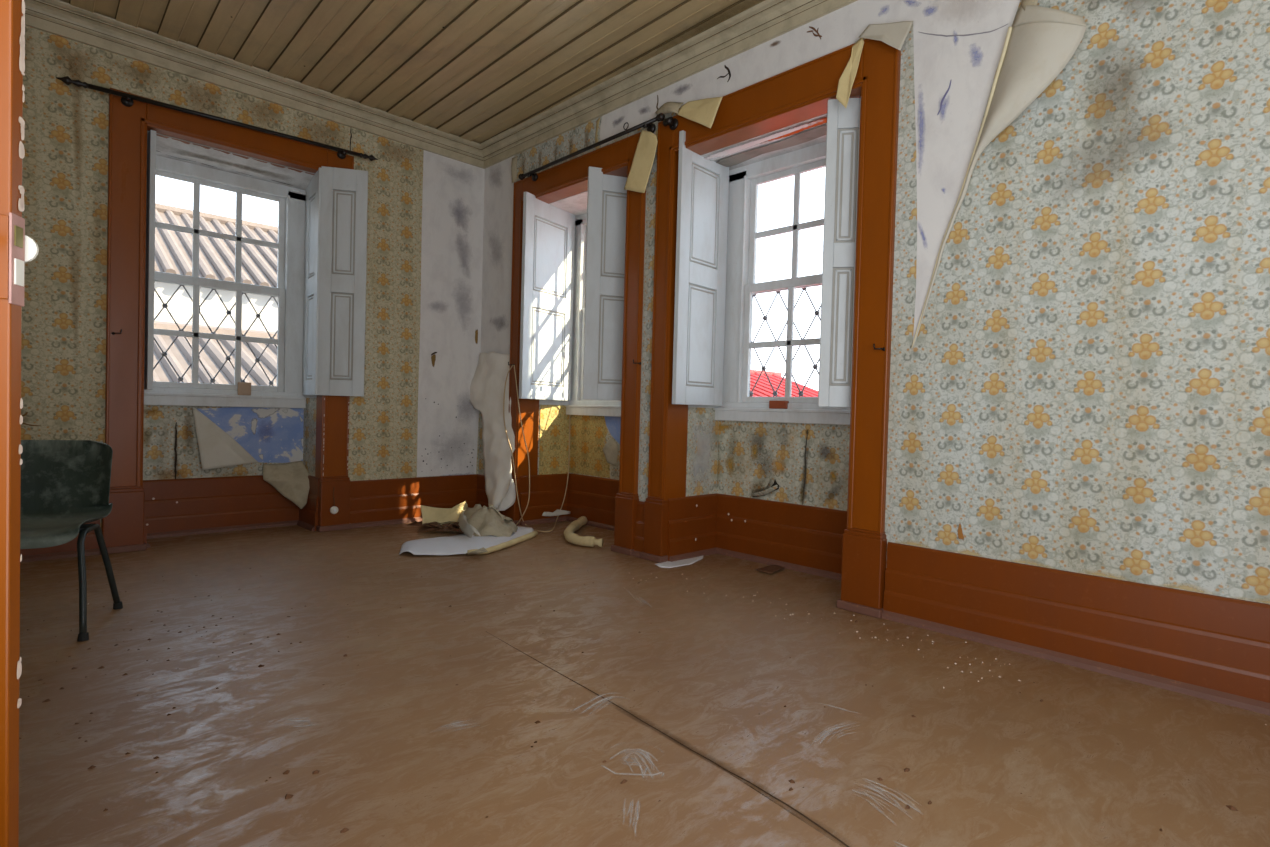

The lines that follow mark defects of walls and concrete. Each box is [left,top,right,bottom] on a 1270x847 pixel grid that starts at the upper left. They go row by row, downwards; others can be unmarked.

flaking render [197,407,304,463]
water stain [423,412,485,475]
flaking render [417,150,514,477]
flaking render [600,0,1020,340]